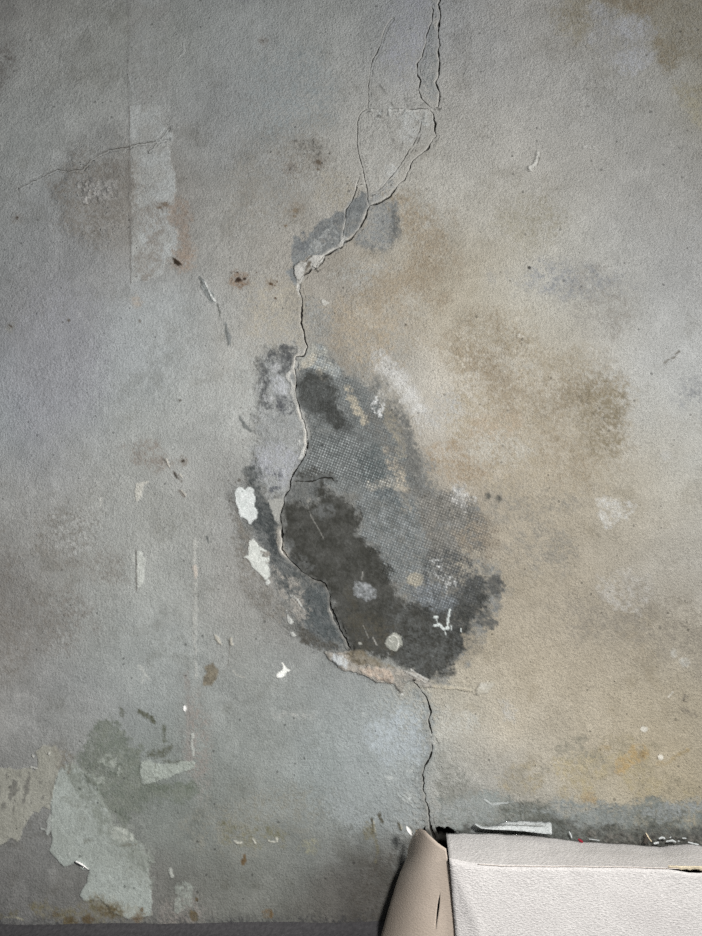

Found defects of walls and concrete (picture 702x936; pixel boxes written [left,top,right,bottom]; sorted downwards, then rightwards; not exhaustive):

water stain [545,0,702,132]
crack [19,127,170,190]
crack [276,0,444,652]
water stain [318,175,642,530]
peeling [276,662,291,679]
water stain [342,582,401,656]
spalling [324,641,433,696]
water stain [595,564,655,619]
peeling [0,742,195,923]
crack [411,680,438,840]
water stain [432,731,702,846]